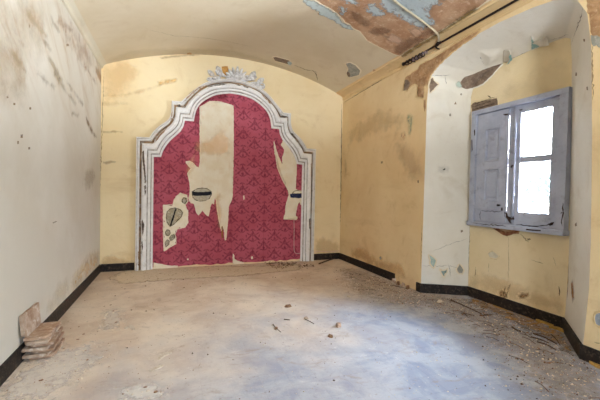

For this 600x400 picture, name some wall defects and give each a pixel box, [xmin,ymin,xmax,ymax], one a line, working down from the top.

flaking render [304,0,490,56]
flaking render [345,62,361,78]
flaking render [404,29,481,112]
flaking render [460,48,515,95]
flaking render [492,207,541,240]